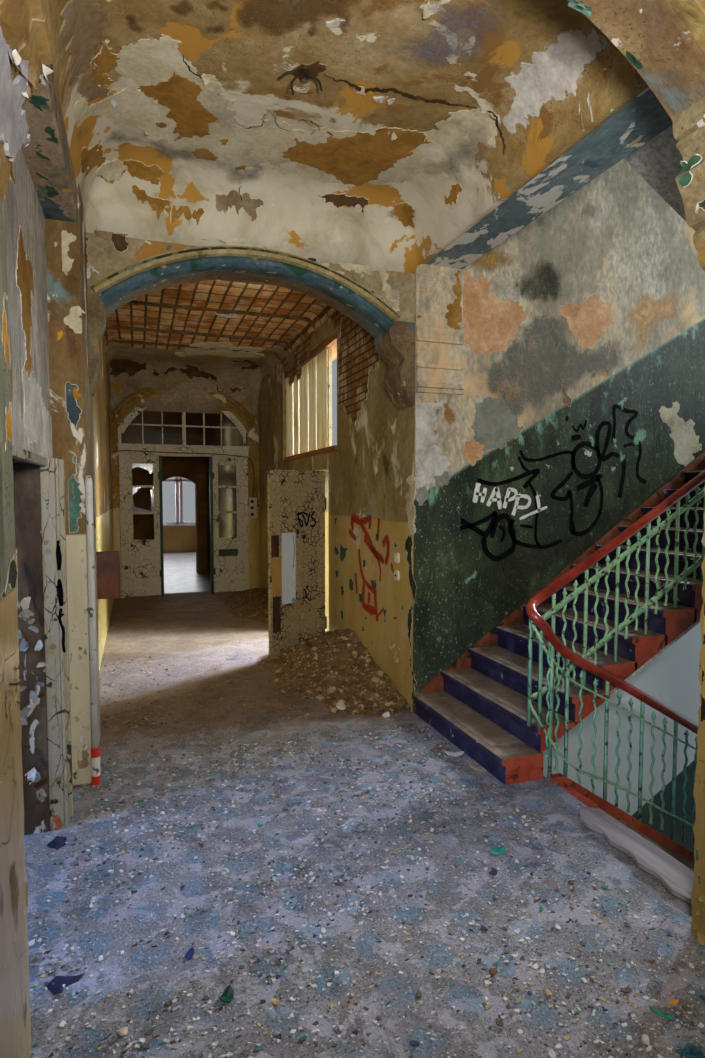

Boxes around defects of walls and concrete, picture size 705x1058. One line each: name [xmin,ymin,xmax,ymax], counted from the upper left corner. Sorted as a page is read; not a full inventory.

water stain [172,1,192,15]
water stain [209,0,354,36]
peeling [626,51,643,87]
peeling [0,0,609,228]
crack [324,74,506,155]
peeling [677,154,702,188]
peeling [35,171,129,279]
peeling [64,306,85,334]
flaking render [444,269,527,359]
flaking render [558,294,615,354]
flaking render [109,327,318,394]
flaking render [329,310,380,425]